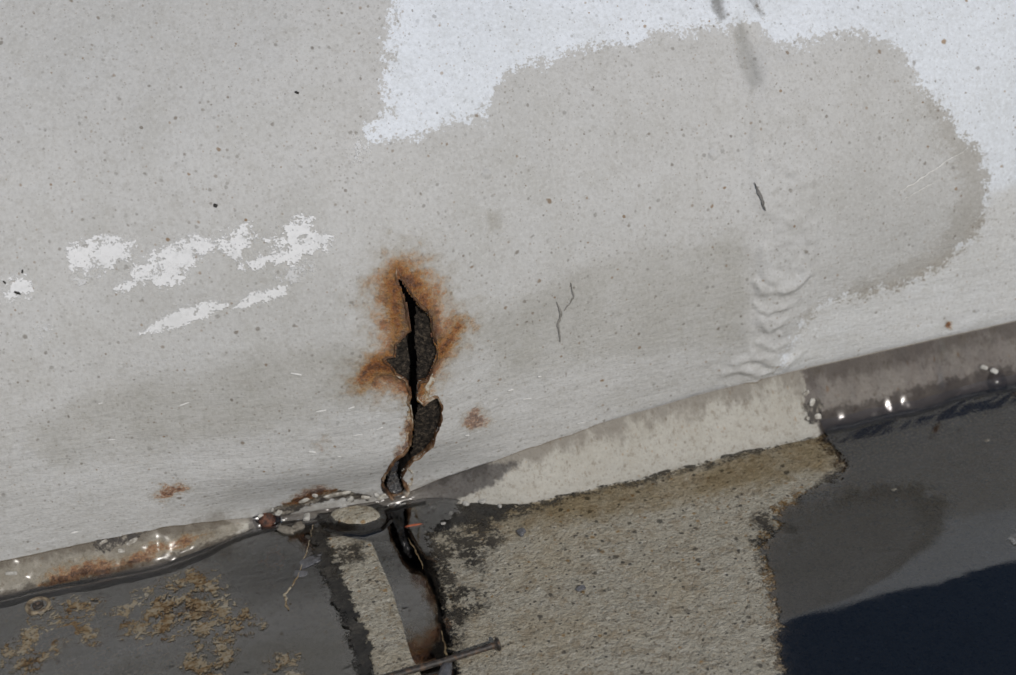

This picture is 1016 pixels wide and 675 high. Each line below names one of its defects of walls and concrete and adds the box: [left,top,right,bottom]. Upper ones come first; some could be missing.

peeling [1,269,34,304]
peeling [66,213,334,335]
corrosion [354,259,466,403]
crack [381,268,443,501]
corrosion [465,408,484,430]
corrosion [157,483,190,498]